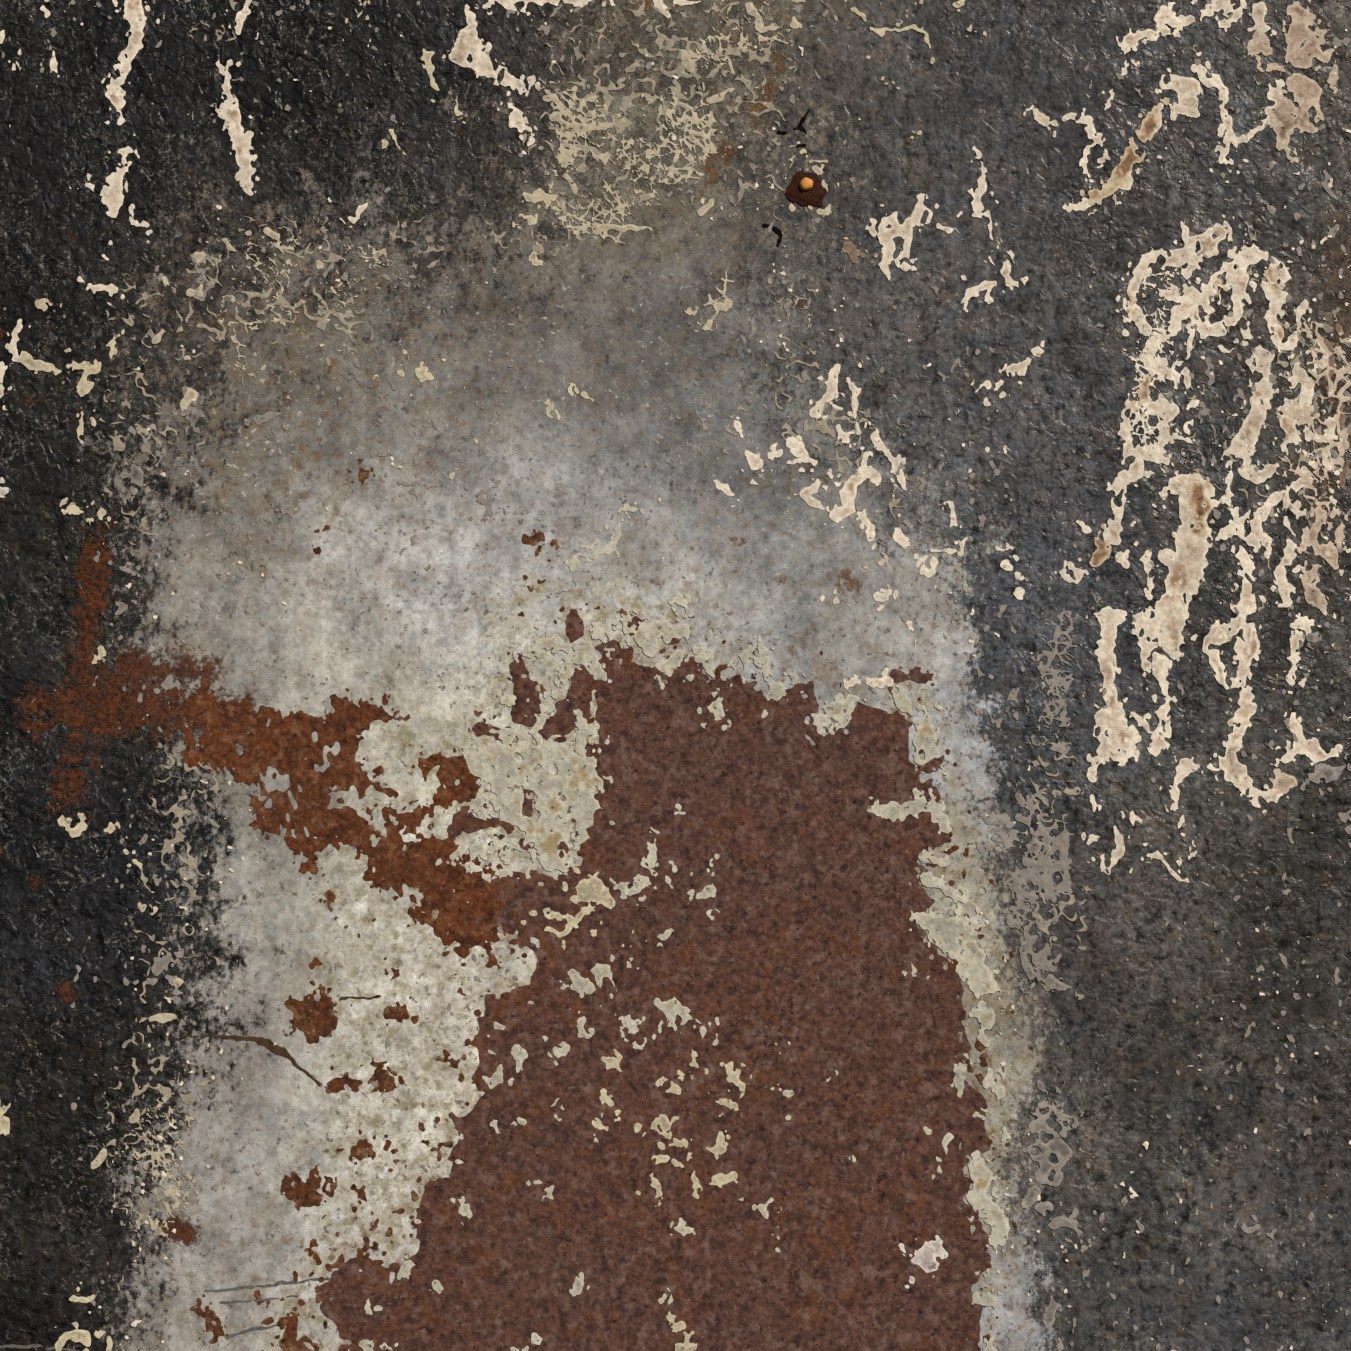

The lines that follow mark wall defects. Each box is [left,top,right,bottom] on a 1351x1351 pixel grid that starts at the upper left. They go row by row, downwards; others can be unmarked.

peeling [1023,0,1349,216]
rust [348,459,376,492]
rust [13,524,1010,1351]
peeling [0,0,1071,1351]
peeling [1054,214,1351,883]